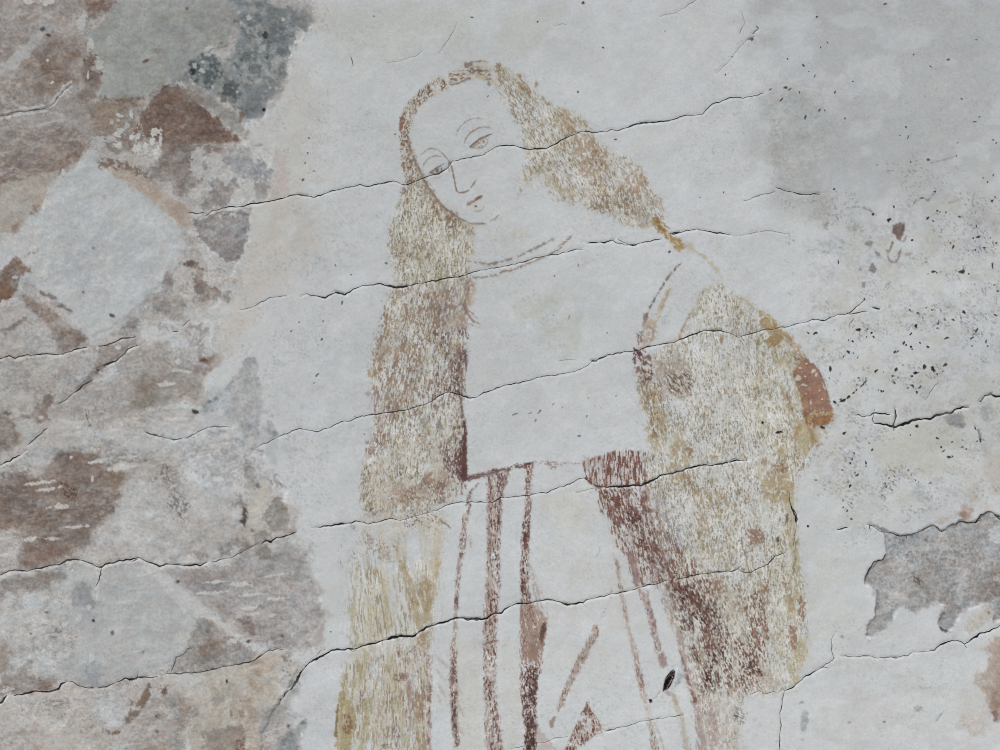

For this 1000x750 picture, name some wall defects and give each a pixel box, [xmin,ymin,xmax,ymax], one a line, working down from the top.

crack [189,93,762,216]
crack [744,188,820,201]
crack [240,229,789,310]
flaking render [0,0,332,750]
crack [259,300,880,446]
crack [857,385,1000,429]
crack [319,458,747,528]
crack [0,532,296,585]
crack [280,492,798,700]
flaking render [863,511,1000,648]
crack [0,648,284,707]
crack [750,625,1000,750]